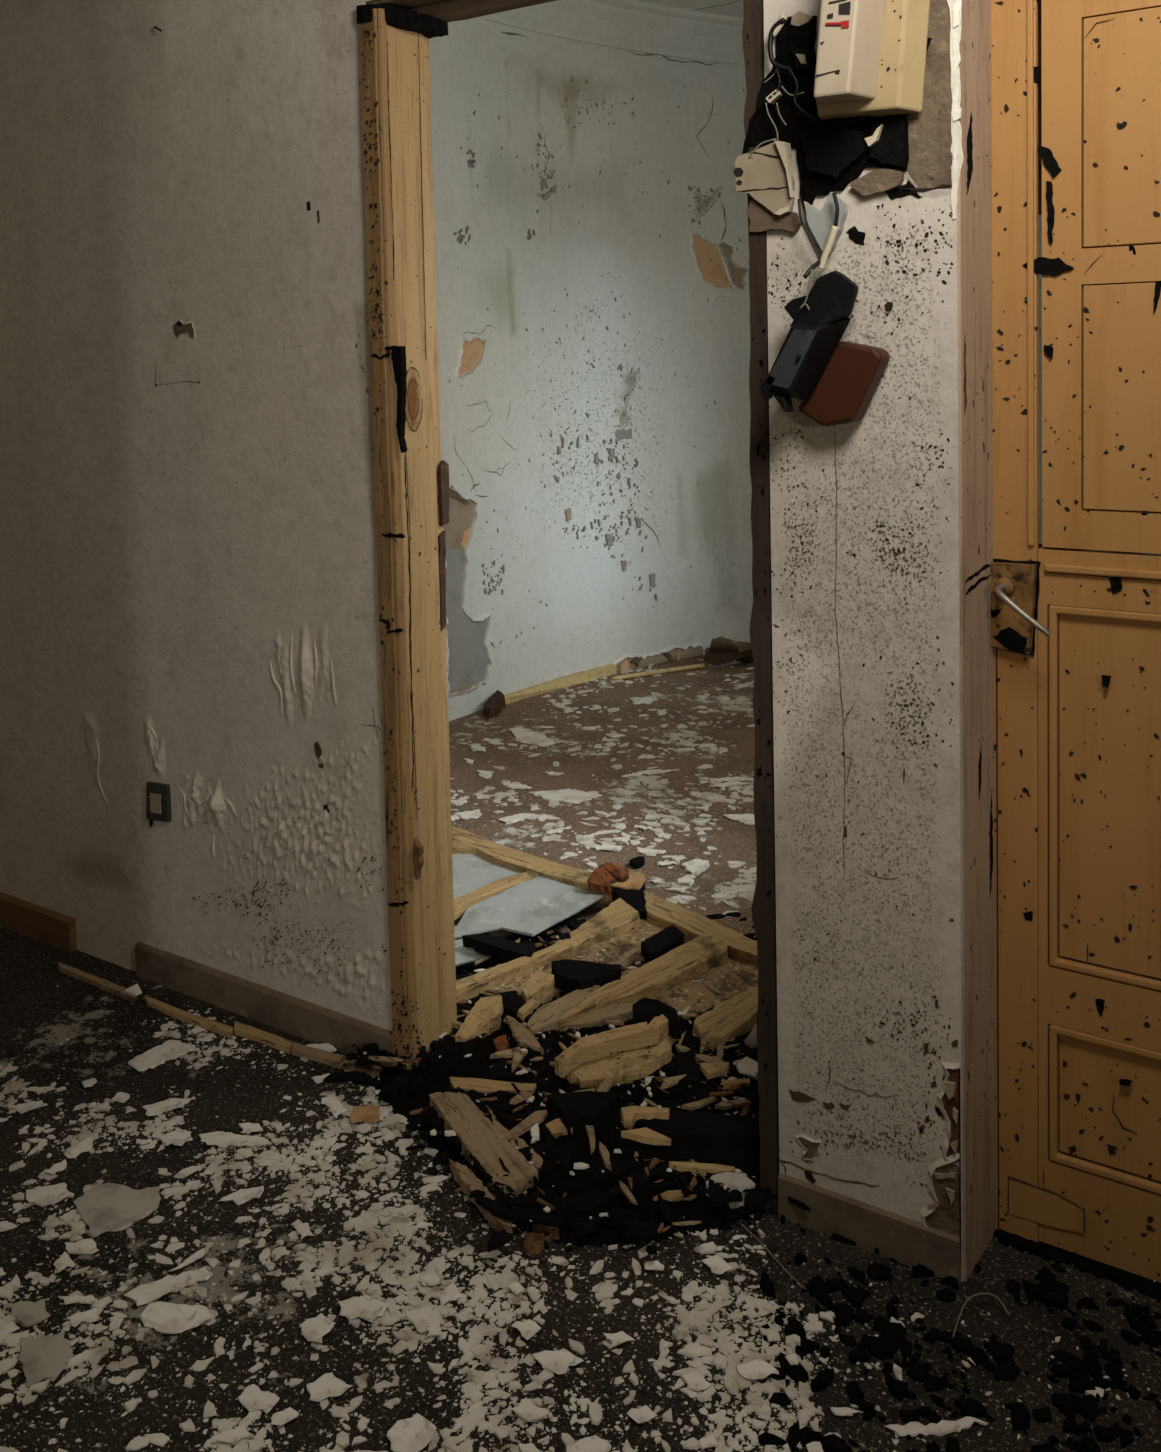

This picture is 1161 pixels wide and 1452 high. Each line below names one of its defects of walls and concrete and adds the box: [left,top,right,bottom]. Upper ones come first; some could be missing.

spalling [727,0,992,219]
flaking render [688,185,763,302]
flaking render [449,308,504,432]
peeling [485,272,658,608]
peeling [964,311,1039,460]
flaking render [443,474,535,698]